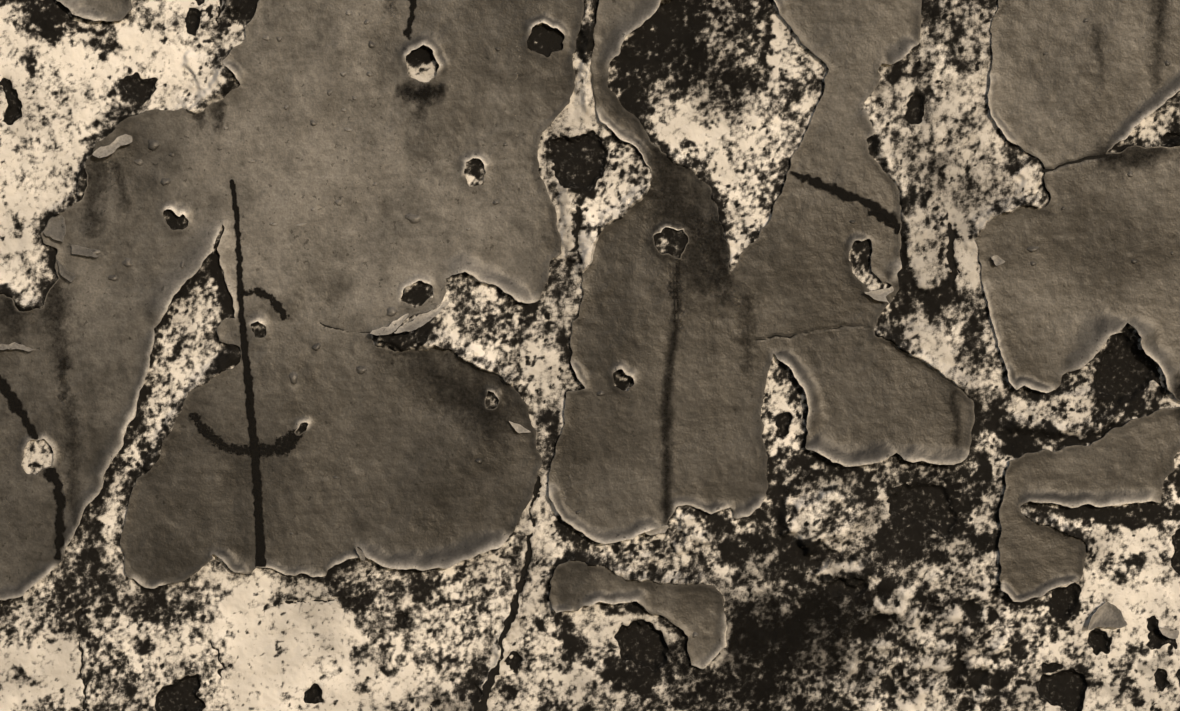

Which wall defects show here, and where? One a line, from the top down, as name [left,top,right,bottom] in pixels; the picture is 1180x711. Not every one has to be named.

damp [403,0,417,40]
damp [240,324,266,567]
peeling [0,0,655,711]
peeling [502,0,1180,711]
crack [474,475,542,711]